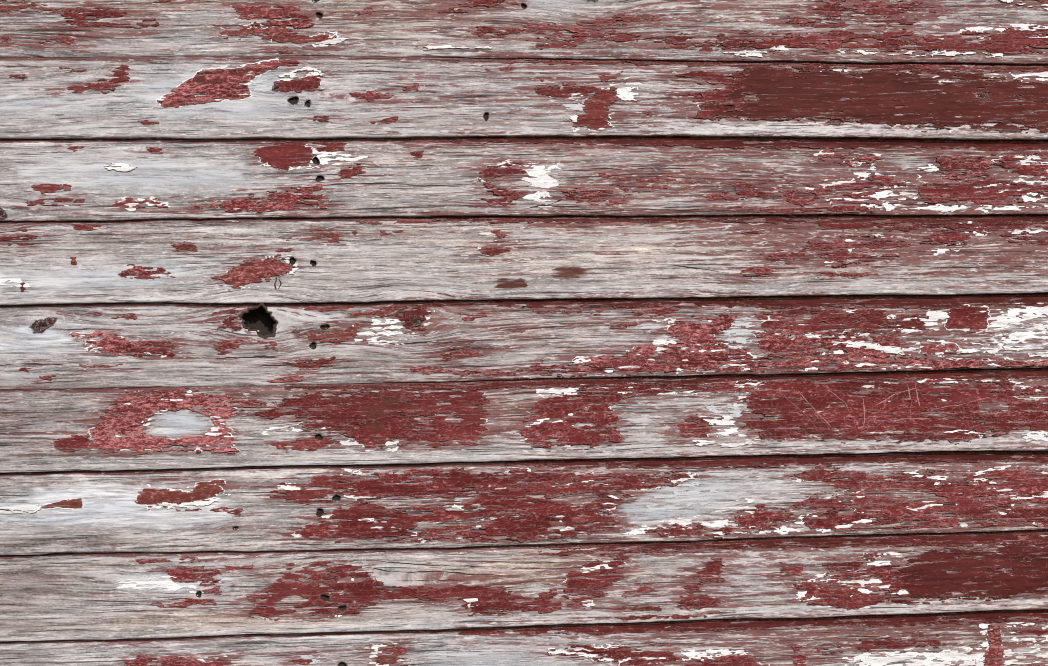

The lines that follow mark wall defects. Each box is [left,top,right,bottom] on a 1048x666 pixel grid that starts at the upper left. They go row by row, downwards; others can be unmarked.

peeling [0,0,159,45]
peeling [155,4,348,108]
peeling [59,65,130,94]
peeling [349,0,1048,279]
peeling [254,140,368,179]
peeling [26,183,85,207]
peeling [111,196,170,213]
peeling [190,183,327,213]
peeling [118,264,175,279]
peeling [171,241,223,252]
peeling [211,229,340,290]
peeling [53,294,1048,666]